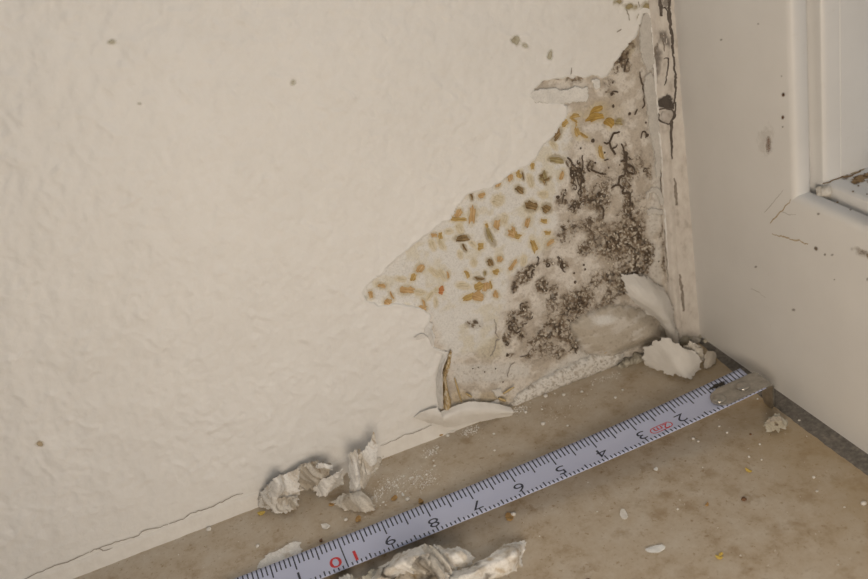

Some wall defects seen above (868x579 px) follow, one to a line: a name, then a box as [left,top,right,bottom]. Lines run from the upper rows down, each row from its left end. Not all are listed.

peeling [363,13,679,427]
leakage [490,131,666,383]
crack [26,493,243,579]